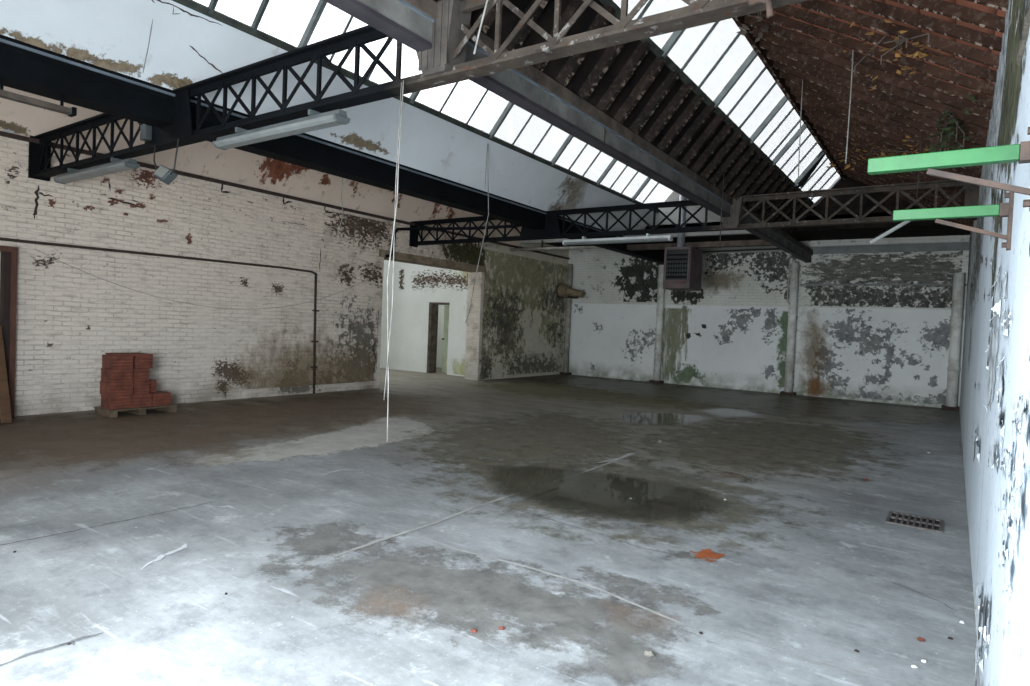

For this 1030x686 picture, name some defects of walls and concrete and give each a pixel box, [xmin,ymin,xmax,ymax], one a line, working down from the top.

crack [143,0,221,72]
crack [33,185,51,219]
leakage [0,295,438,466]
peeling [324,210,397,289]
peeling [398,267,468,291]
peeling [609,257,662,302]
peeling [671,288,704,305]
leakage [479,282,951,424]
peeling [686,307,778,345]
peeling [704,252,953,405]
peeling [968,186,1030,601]
leakage [418,458,800,547]